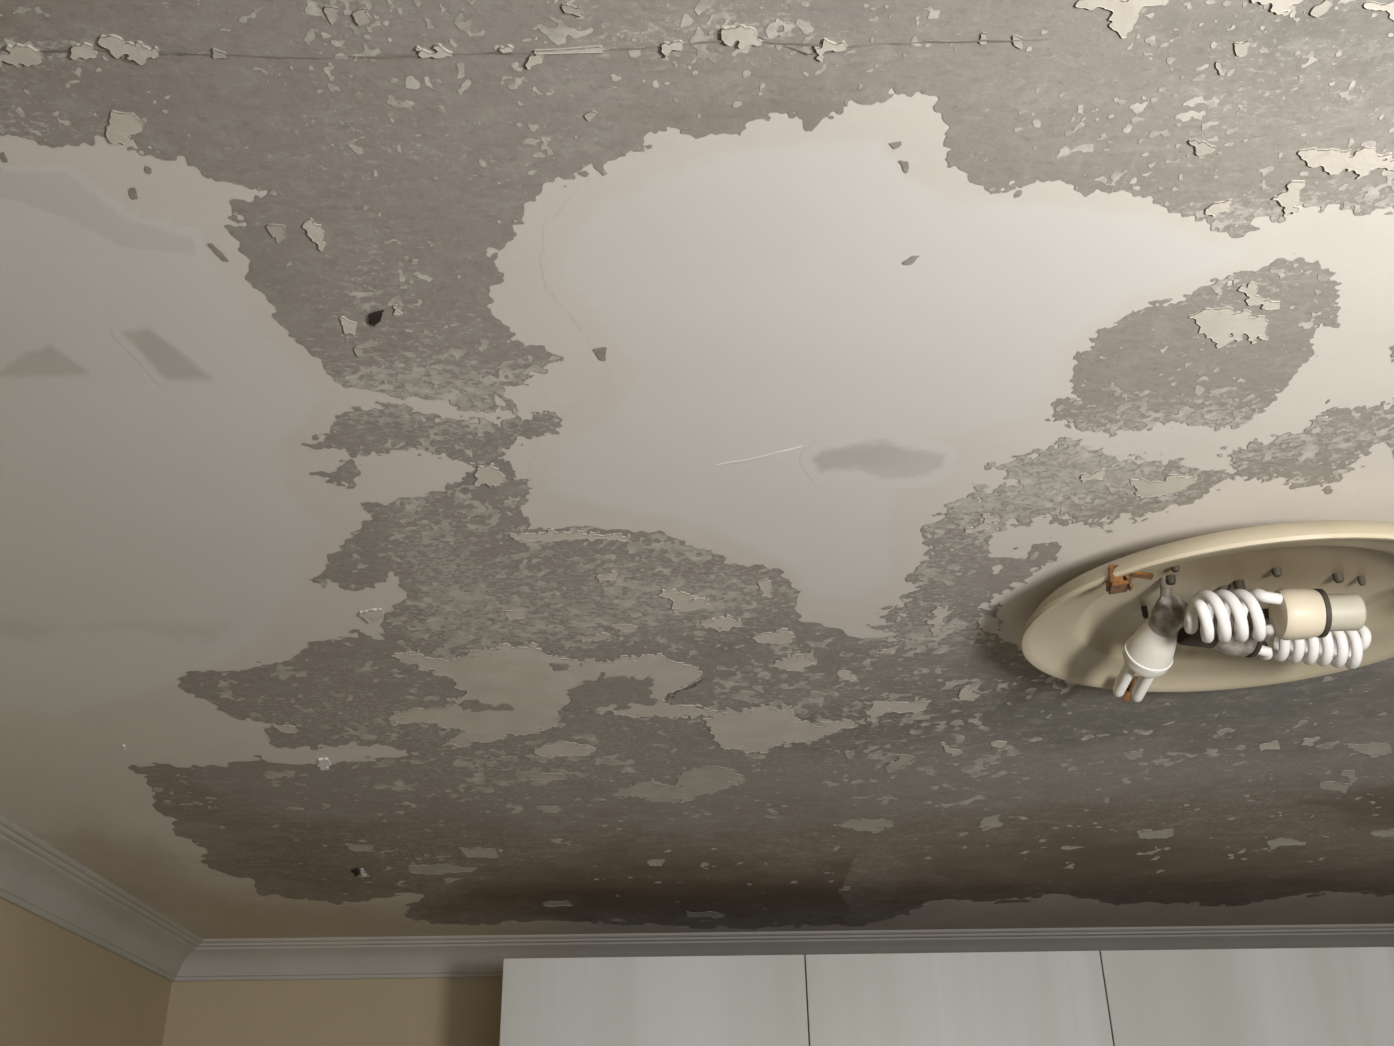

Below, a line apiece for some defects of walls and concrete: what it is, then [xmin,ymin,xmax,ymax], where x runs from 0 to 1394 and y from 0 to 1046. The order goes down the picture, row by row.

crack [0,24,1046,69]
peeling [0,0,1394,438]
peeling [128,401,1394,921]
water stain [799,428,956,490]